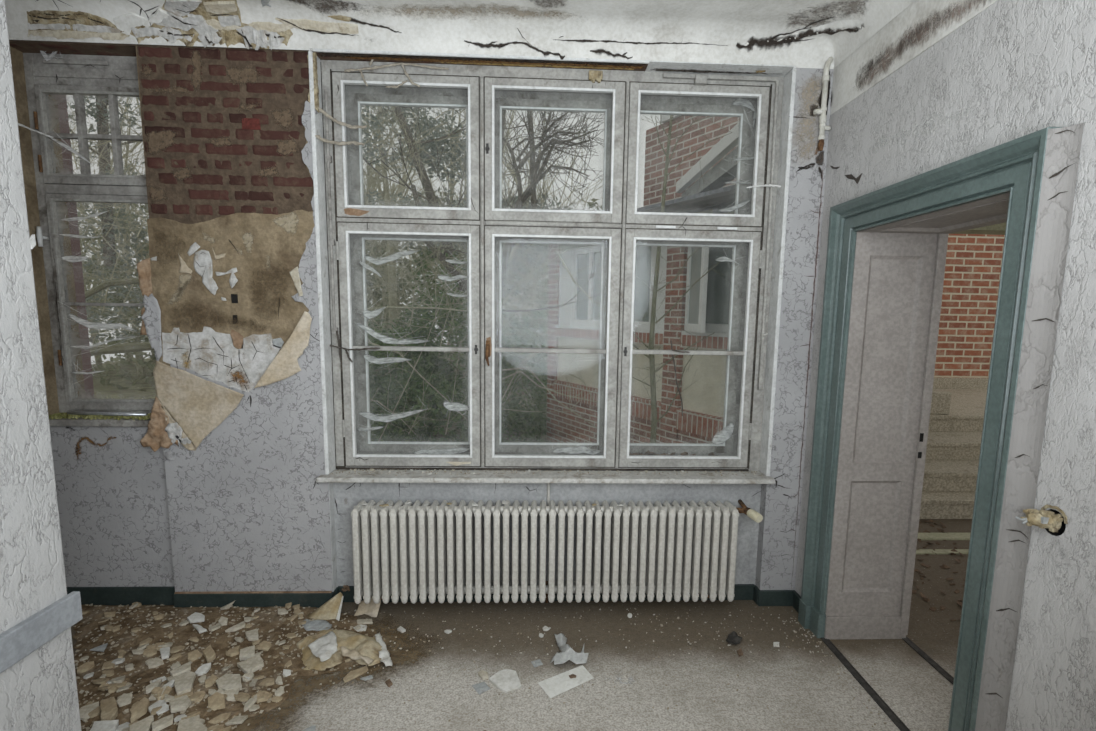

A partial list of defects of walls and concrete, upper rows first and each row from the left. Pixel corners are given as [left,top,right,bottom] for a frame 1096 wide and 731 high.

water stain [289,0,357,12]
water stain [395,0,564,17]
water stain [789,0,865,26]
crack [464,28,727,60]
water stain [856,0,985,88]
flaking render [131,0,319,393]
rust [67,427,116,459]
spalling [1015,504,1068,536]